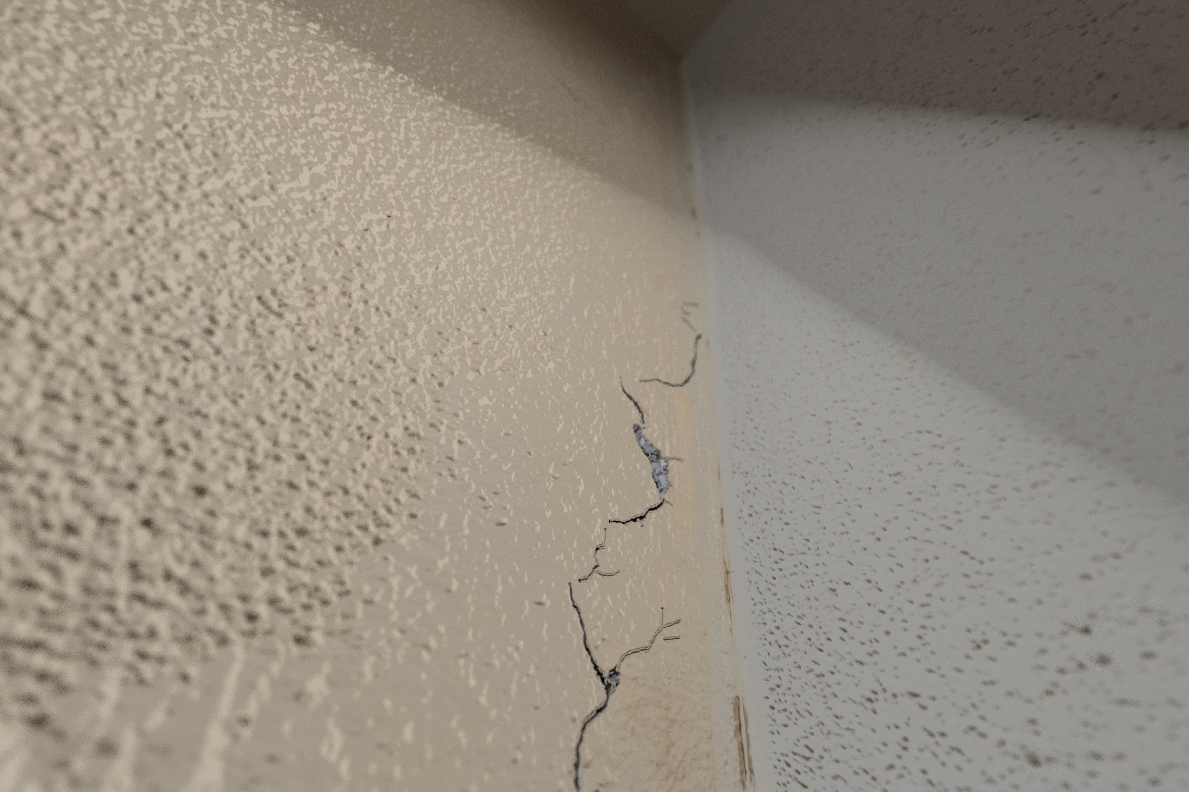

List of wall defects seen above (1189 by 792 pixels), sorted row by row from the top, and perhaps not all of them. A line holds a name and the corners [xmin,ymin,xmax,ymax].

crack [568,300,702,792]